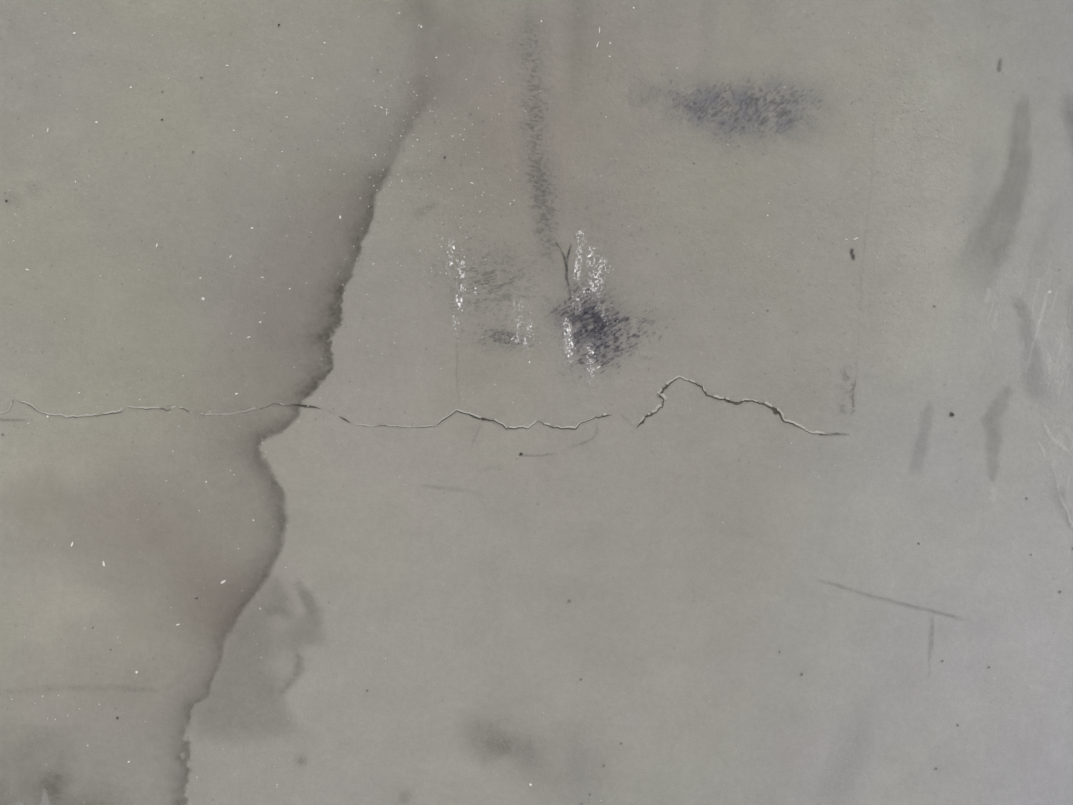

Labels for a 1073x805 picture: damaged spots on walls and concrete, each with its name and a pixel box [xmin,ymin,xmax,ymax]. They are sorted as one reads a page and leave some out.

crack [0,399,609,430]
crack [636,376,827,435]